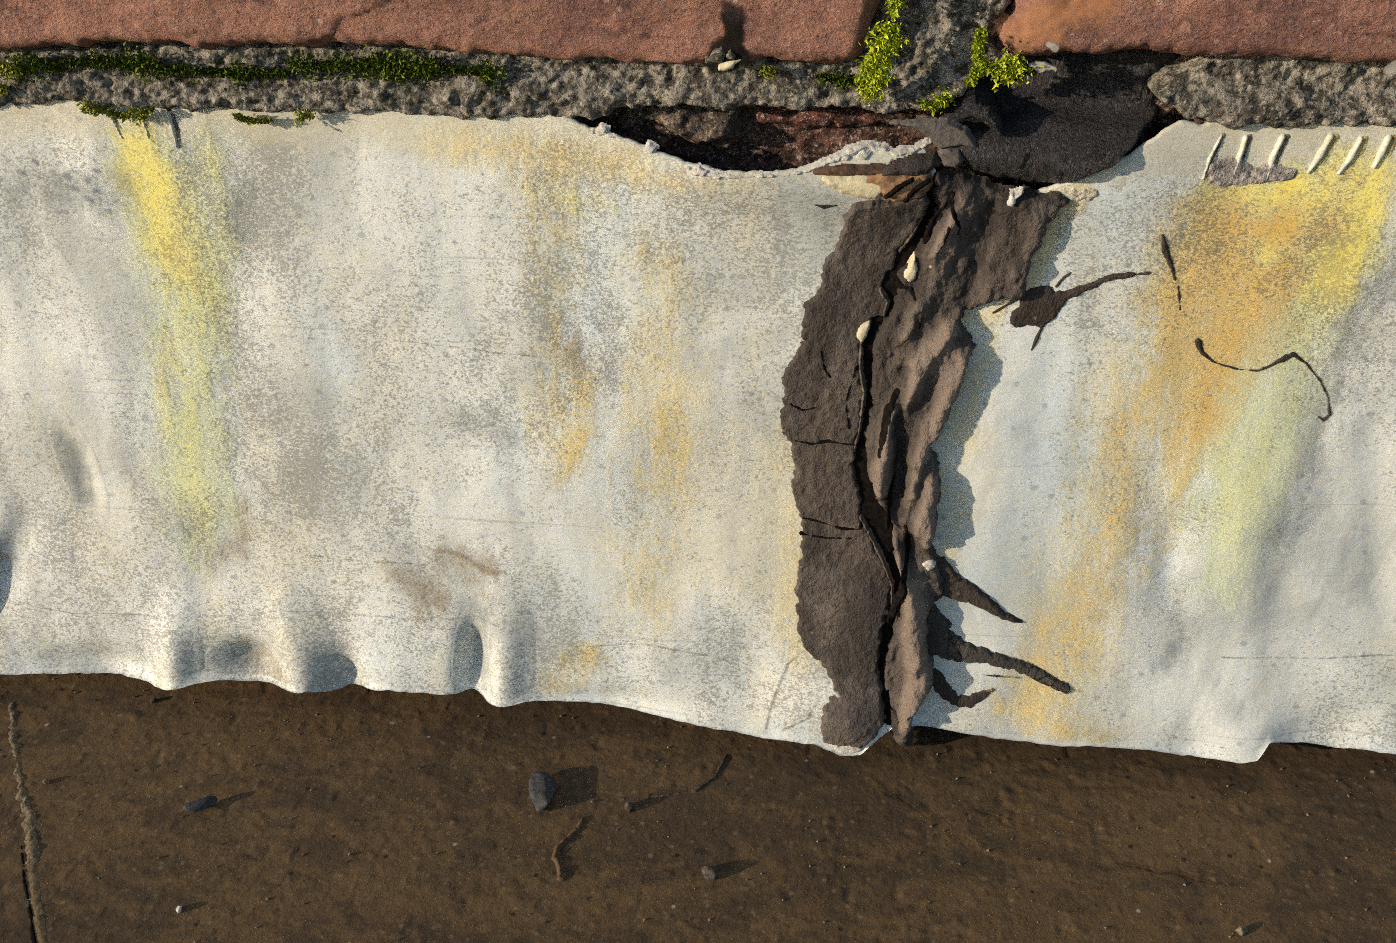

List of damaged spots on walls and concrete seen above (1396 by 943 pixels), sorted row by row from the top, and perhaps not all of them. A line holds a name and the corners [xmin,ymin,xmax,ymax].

spalling [596,103,976,203]
peeling [1007,186,1025,207]
spalling [904,252,918,282]
spalling [857,320,870,342]
peeling [922,559,936,571]